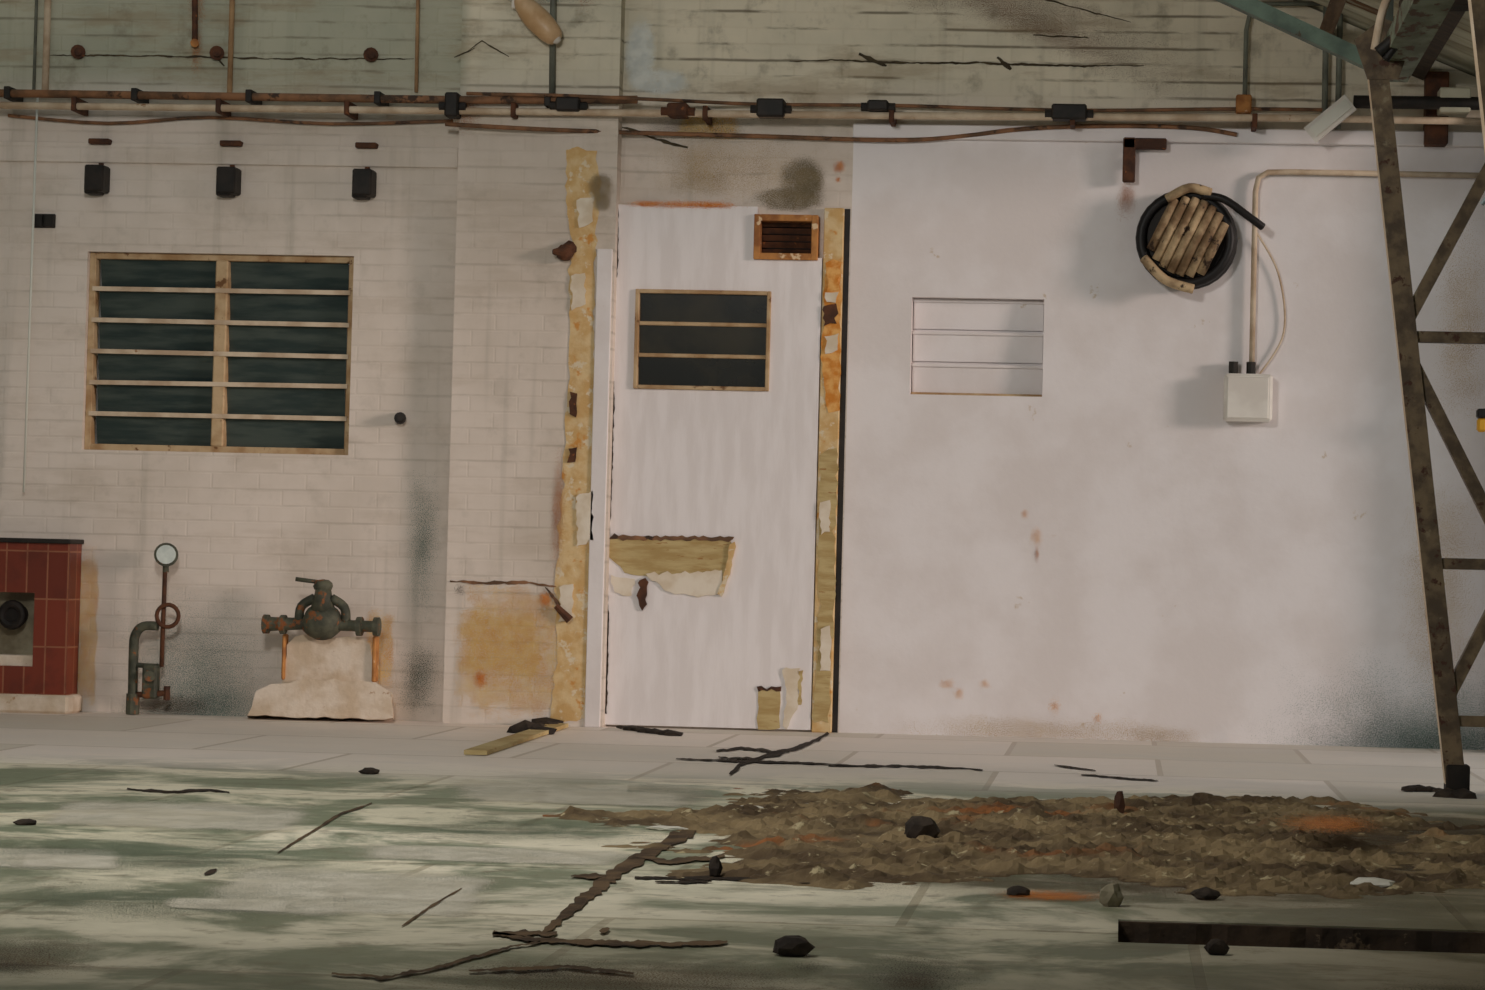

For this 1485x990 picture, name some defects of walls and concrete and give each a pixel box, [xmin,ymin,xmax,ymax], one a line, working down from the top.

flaking render [550,146,736,722]
crack [676,732,983,775]
crack [1056,765,1158,781]
crack [332,830,755,980]